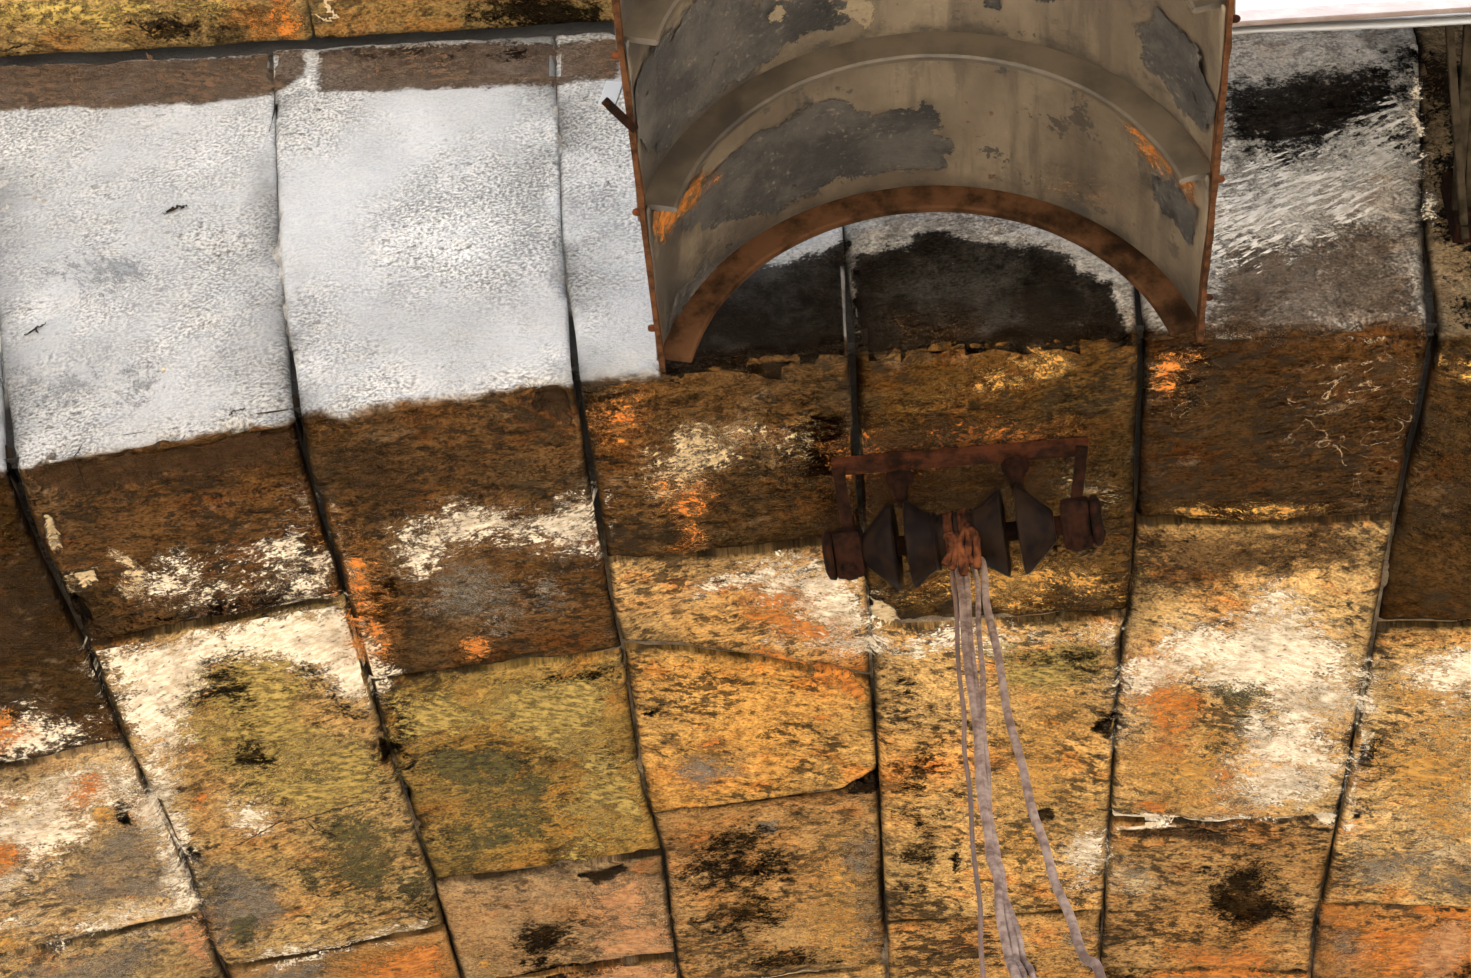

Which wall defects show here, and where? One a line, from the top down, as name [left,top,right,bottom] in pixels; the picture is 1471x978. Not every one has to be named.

peeling [635,0,884,159]
peeling [1132,7,1215,134]
peeling [670,98,955,233]
peeling [1149,173,1198,246]
damp [1204,40,1471,349]
peeling [666,243,733,333]
rust [819,428,898,481]
rust [930,415,1083,447]
damp [635,230,1471,944]
damp [0,391,626,978]
damp [471,810,883,978]
damp [1409,917,1471,978]